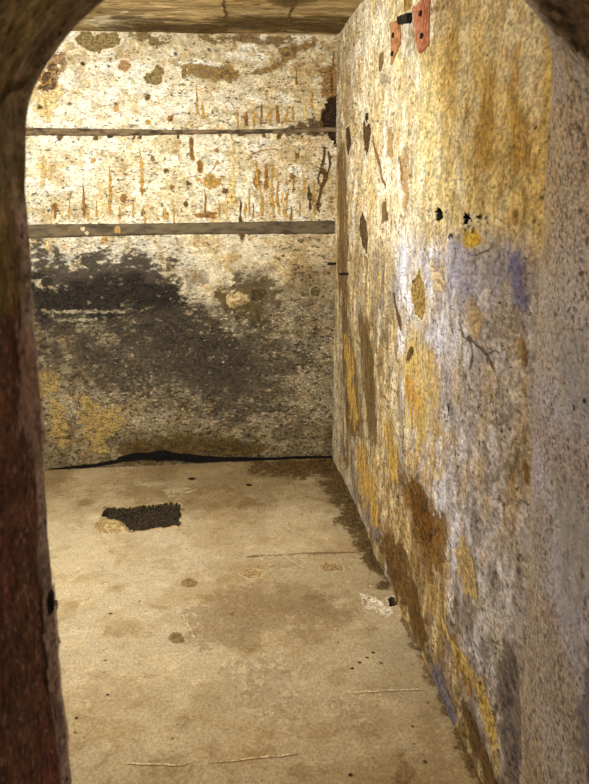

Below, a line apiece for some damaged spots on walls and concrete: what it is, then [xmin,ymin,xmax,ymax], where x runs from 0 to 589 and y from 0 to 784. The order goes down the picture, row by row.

crack [220,0,228,29]
rust [36,157,51,185]
rust [51,195,70,219]
rust [82,88,321,224]
water stain [31,143,399,590]
crack [458,321,500,391]
water stain [454,497,482,602]
water stain [400,612,482,784]